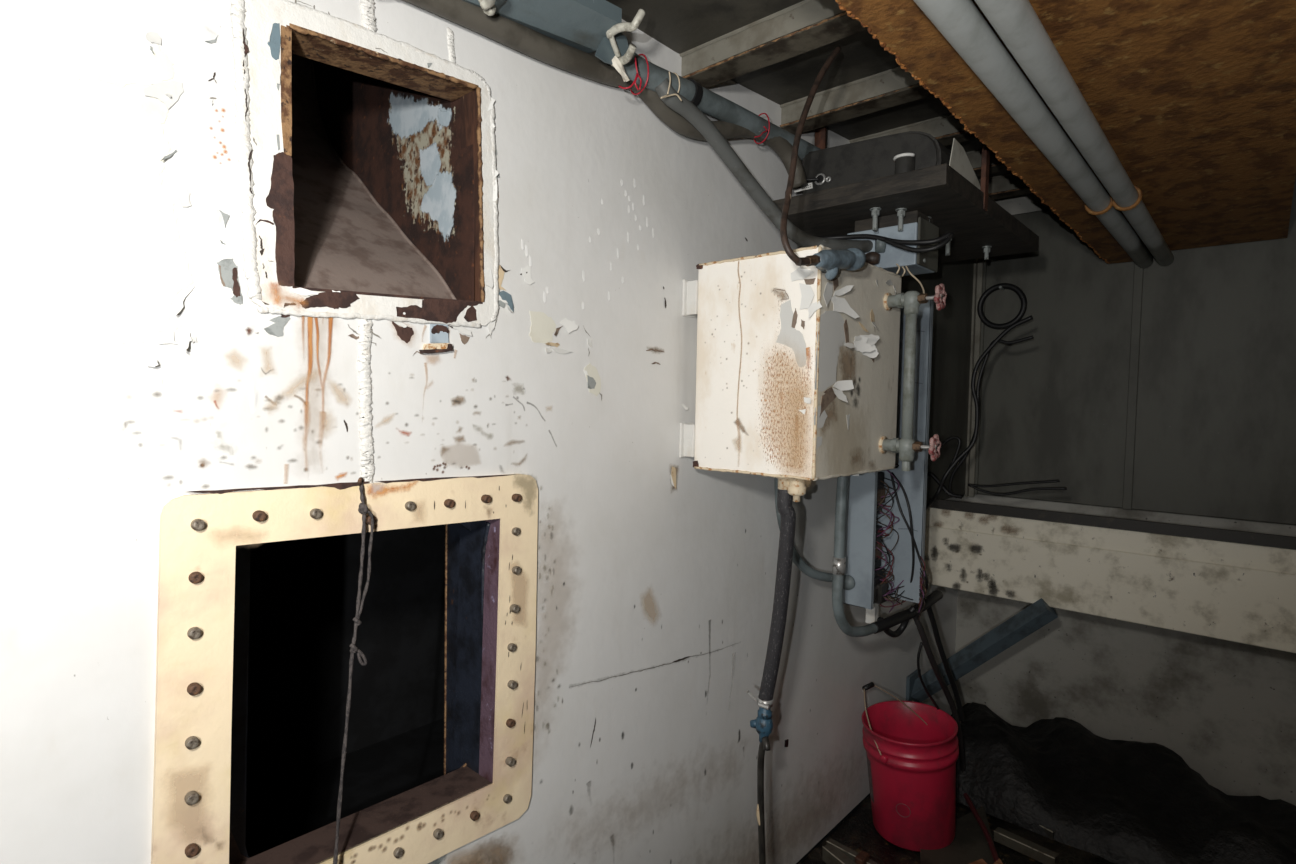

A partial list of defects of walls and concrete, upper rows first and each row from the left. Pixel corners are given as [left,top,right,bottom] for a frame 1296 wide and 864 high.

rust [266,24,485,410]
peeling [264,314,290,337]
peeling [484,240,602,401]
water stain [924,539,1014,596]